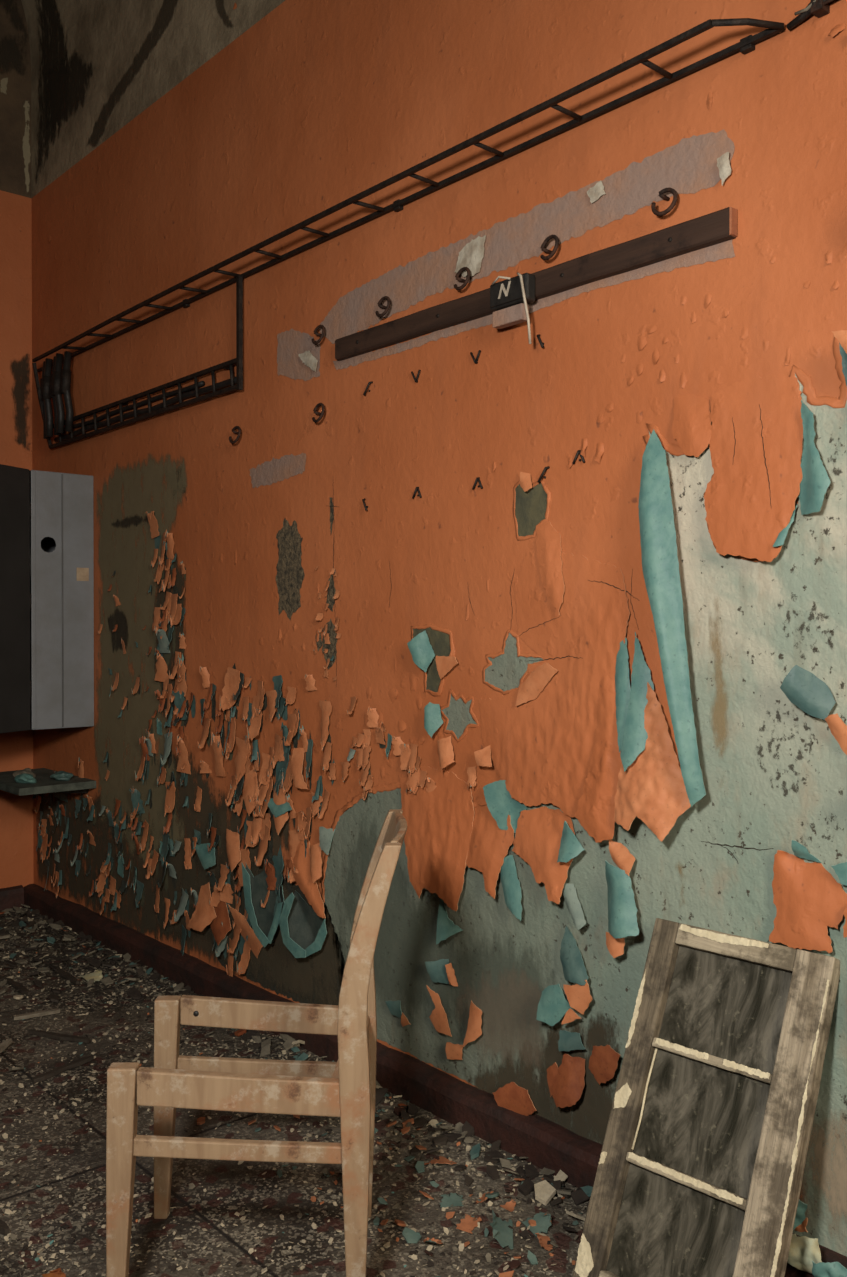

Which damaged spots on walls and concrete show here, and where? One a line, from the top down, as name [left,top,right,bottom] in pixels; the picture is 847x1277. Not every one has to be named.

water stain [0,0,92,179]
water stain [88,0,178,147]
water stain [216,0,232,27]
peeling [33,330,847,1256]